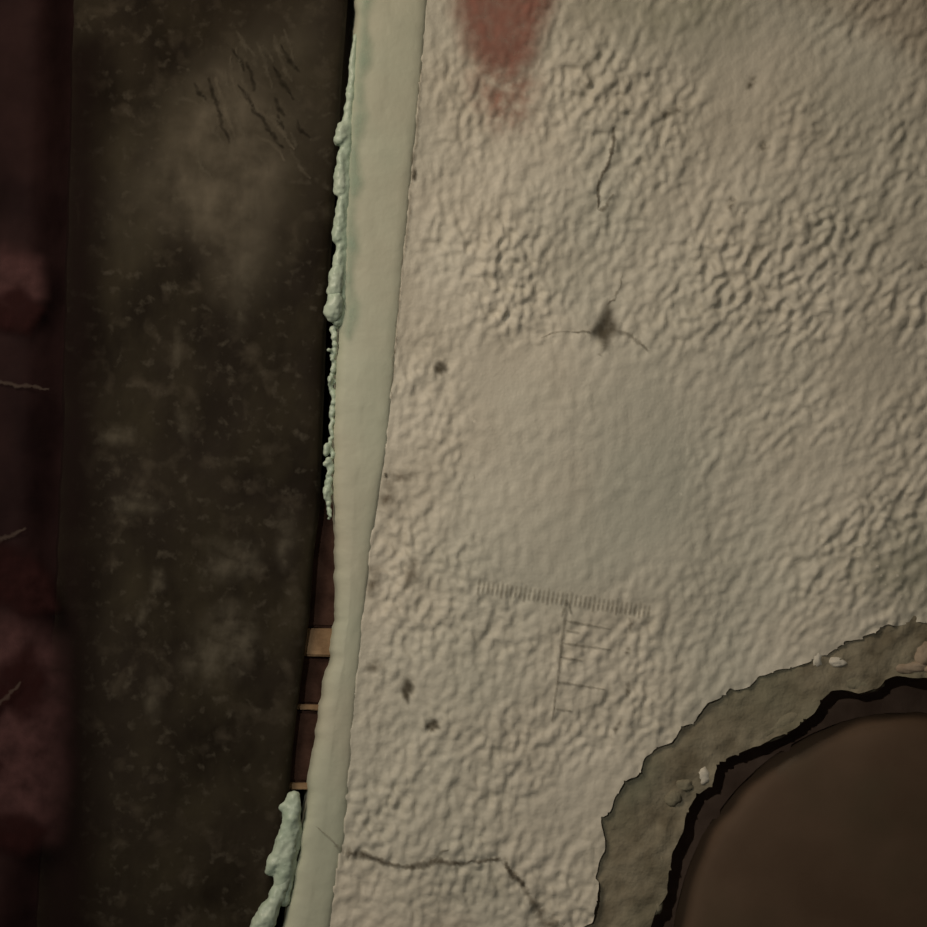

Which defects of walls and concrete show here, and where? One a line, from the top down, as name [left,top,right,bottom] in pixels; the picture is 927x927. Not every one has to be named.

damp [461,0,549,68]
crack [597,128,615,210]
spalling [584,616,927,927]
crack [348,852,554,926]